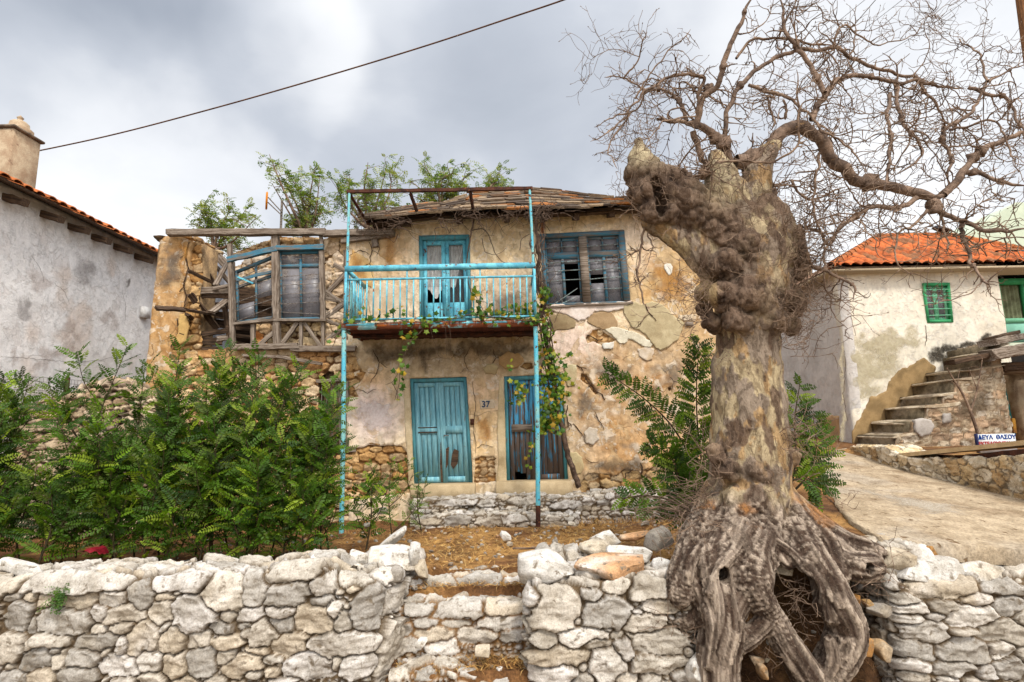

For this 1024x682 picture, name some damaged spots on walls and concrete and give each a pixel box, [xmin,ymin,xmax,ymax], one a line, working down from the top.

spalling [172,237,224,374]
flaking render [586,329,615,345]
water stain [840,328,918,398]
crack [566,365,605,463]
flaking render [345,443,413,499]
flaking render [474,456,496,483]